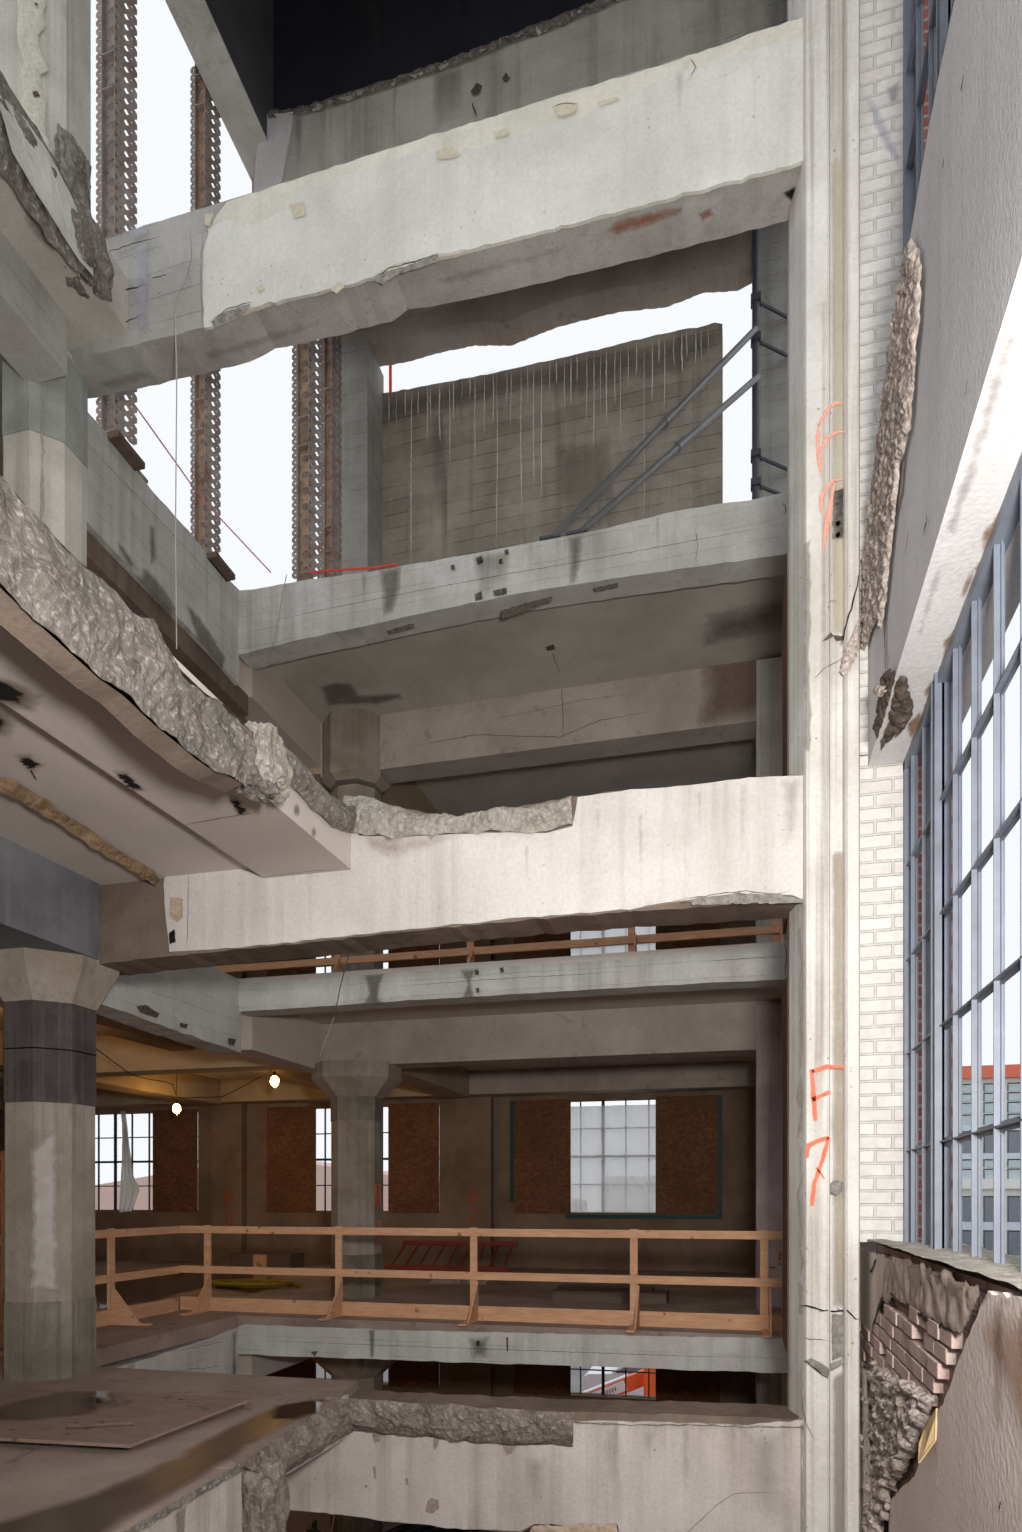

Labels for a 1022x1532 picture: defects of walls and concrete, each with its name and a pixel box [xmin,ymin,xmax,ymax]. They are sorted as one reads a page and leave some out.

spalling [0,0,115,302]
spalling [0,476,574,839]
water stain [384,570,397,609]
water stain [386,331,709,548]
spalling [823,237,922,749]
spalling [125,1398,574,1532]
crack [799,1256,961,1341]
spalling [801,1248,963,1532]